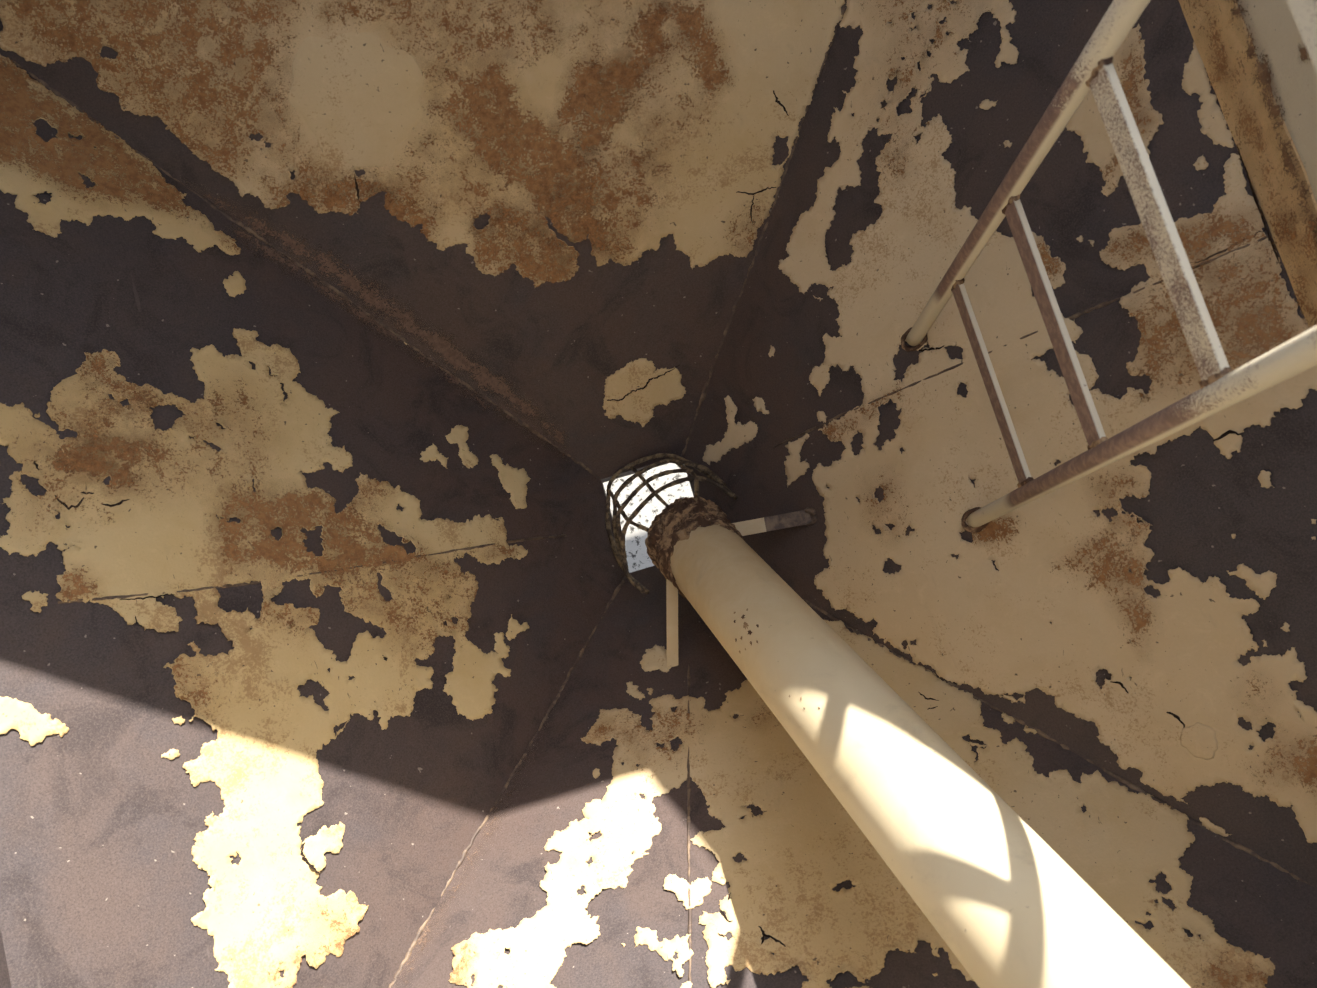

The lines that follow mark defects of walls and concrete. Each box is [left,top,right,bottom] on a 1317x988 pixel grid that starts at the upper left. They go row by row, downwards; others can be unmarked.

rust [12,351,519,655]
peeling [0,328,531,988]
rust [0,0,735,287]
peeling [0,0,845,287]
crack [607,365,680,401]
peeling [602,358,686,427]
peeling [448,680,974,988]
peeling [778,0,1317,843]
peeling [824,620,1275,988]
rust [1052,473,1155,646]
rust [1105,229,1202,401]
rust [1177,0,1317,368]